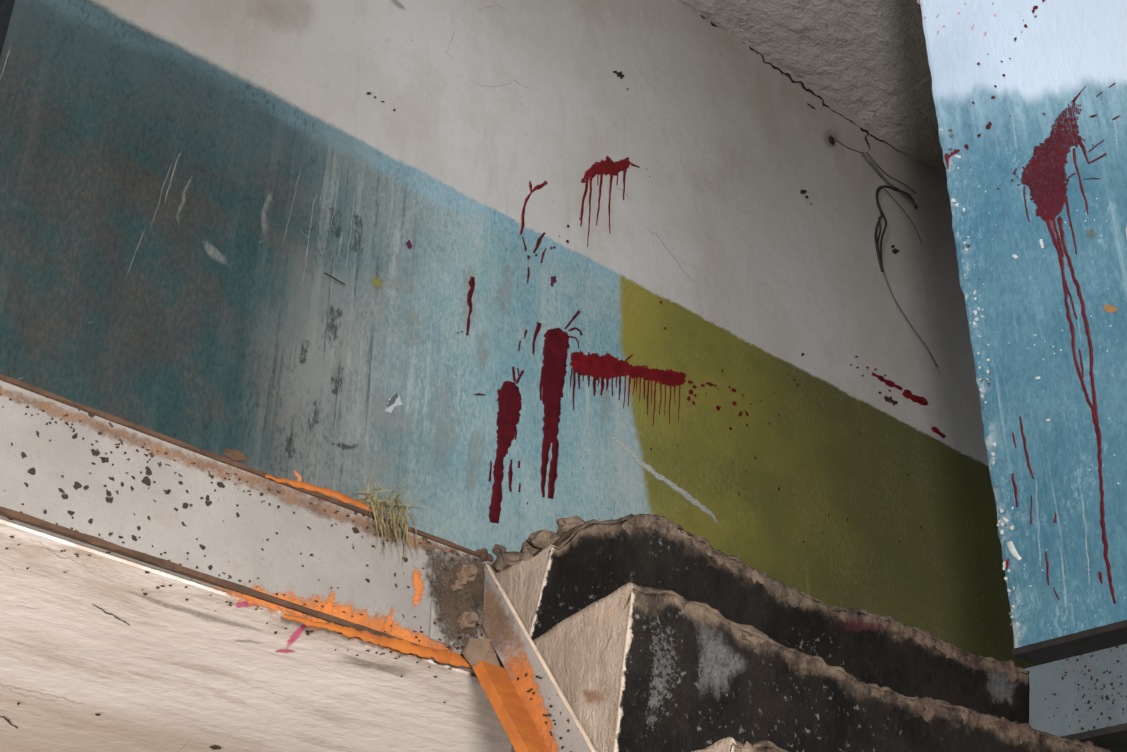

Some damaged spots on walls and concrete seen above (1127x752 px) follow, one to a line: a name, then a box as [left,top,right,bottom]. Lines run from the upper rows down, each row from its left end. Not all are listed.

crack [860,127,908,156]
rust [0,387,459,557]
rust [226,587,473,669]
rust [412,570,424,604]
peeling [647,624,678,731]
spalling [674,593,699,611]
spalling [622,514,815,608]
peeling [700,630,743,690]
spalling [829,608,1020,702]
spalling [741,741,756,752]